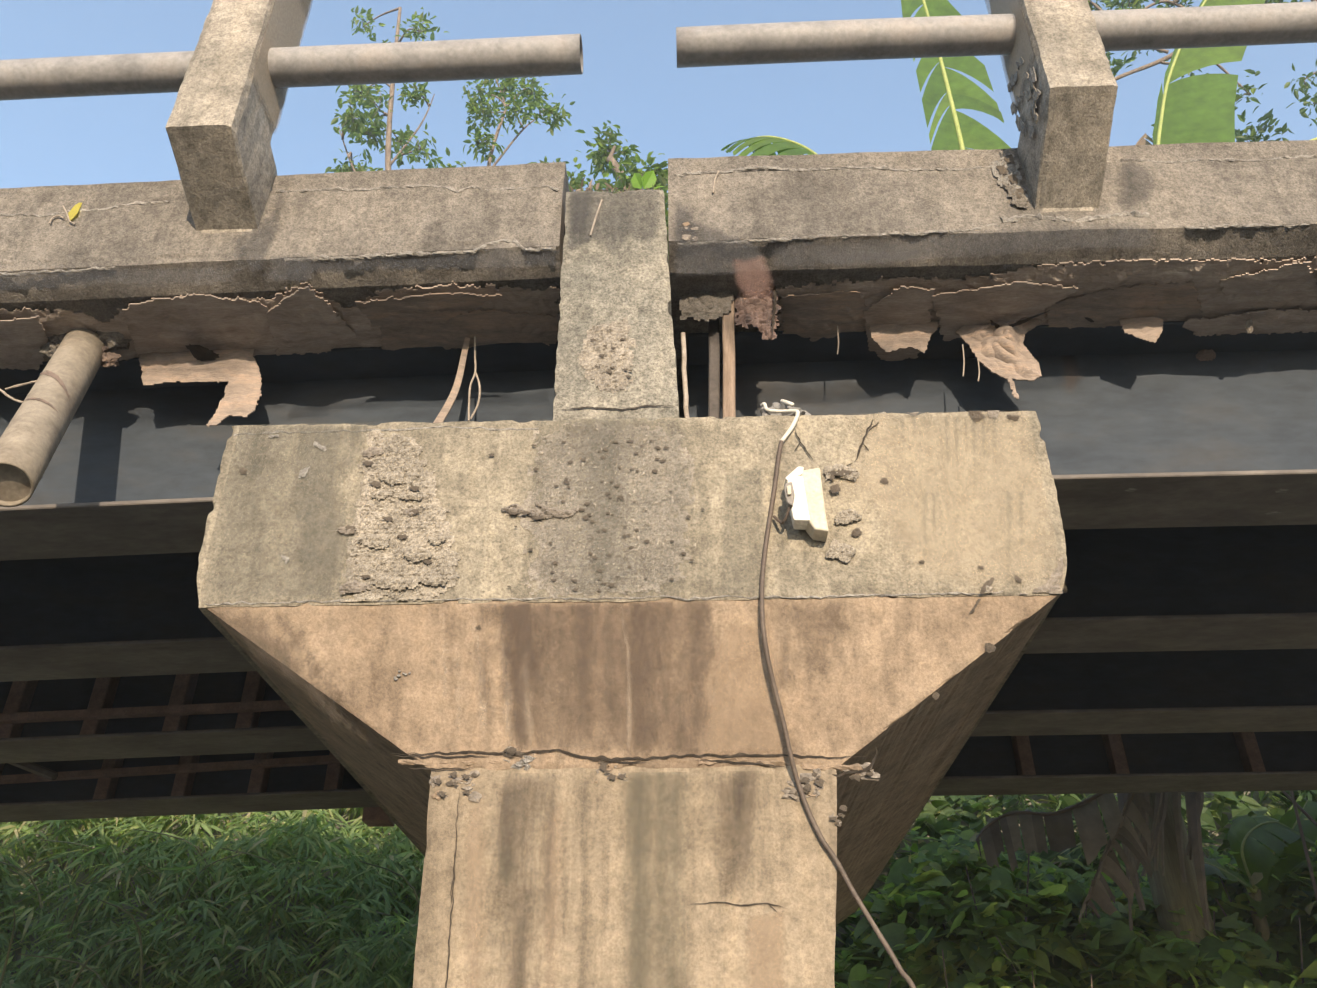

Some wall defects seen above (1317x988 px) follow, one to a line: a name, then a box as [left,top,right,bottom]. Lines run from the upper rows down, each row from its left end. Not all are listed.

peeling [1007,57,1041,139]
spalling [991,153,1029,209]
peeling [0,315,48,370]
peeling [122,286,357,357]
peeling [355,292,559,351]
peeling [780,281,1317,361]
peeling [362,447,384,466]
crack [846,420,880,466]
peeling [382,509,419,539]
peeling [339,575,418,594]
crack [390,745,878,988]